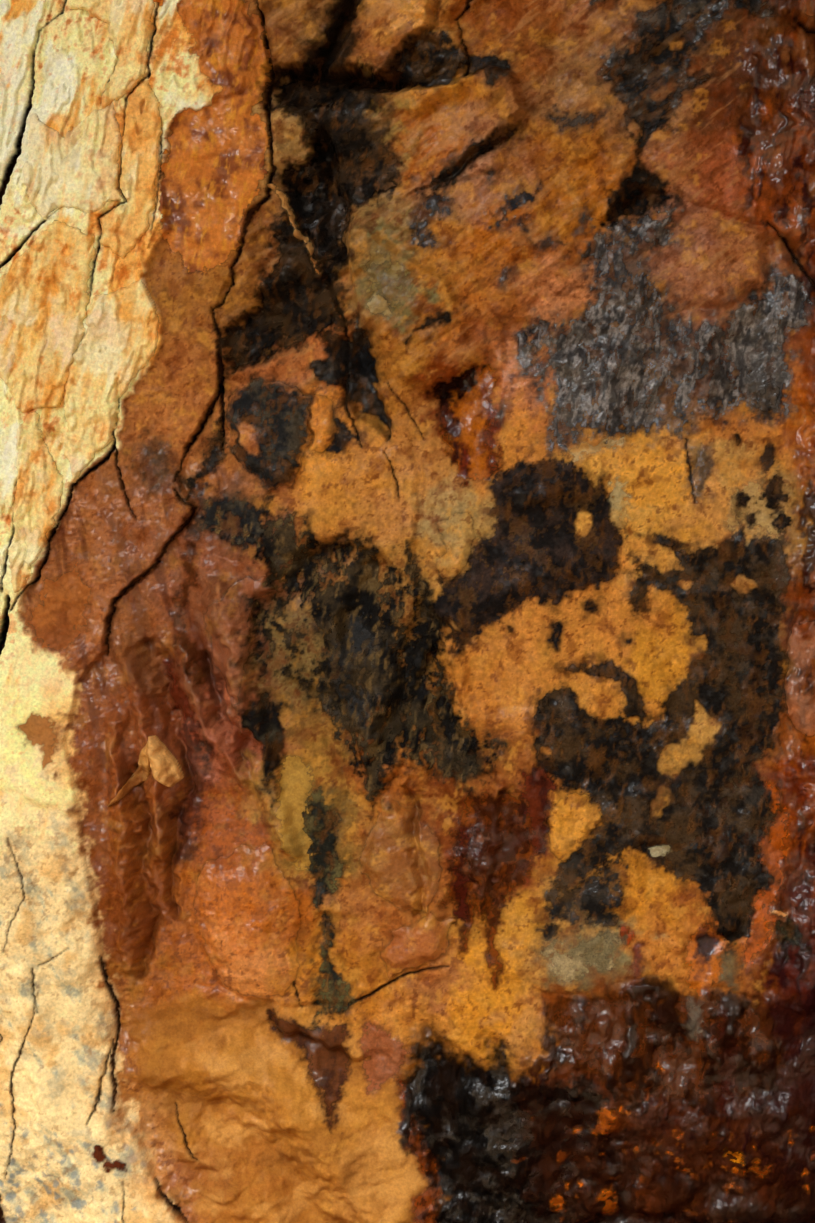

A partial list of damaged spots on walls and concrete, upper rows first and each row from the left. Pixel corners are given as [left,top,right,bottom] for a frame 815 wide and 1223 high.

crack [0,220,45,268]
crack [0,0,67,205]
crack [90,4,159,295]
crack [105,0,277,653]
leakage [132,0,815,983]
crack [90,957,121,1117]
crack [156,1178,187,1221]
crack [176,1105,198,1160]